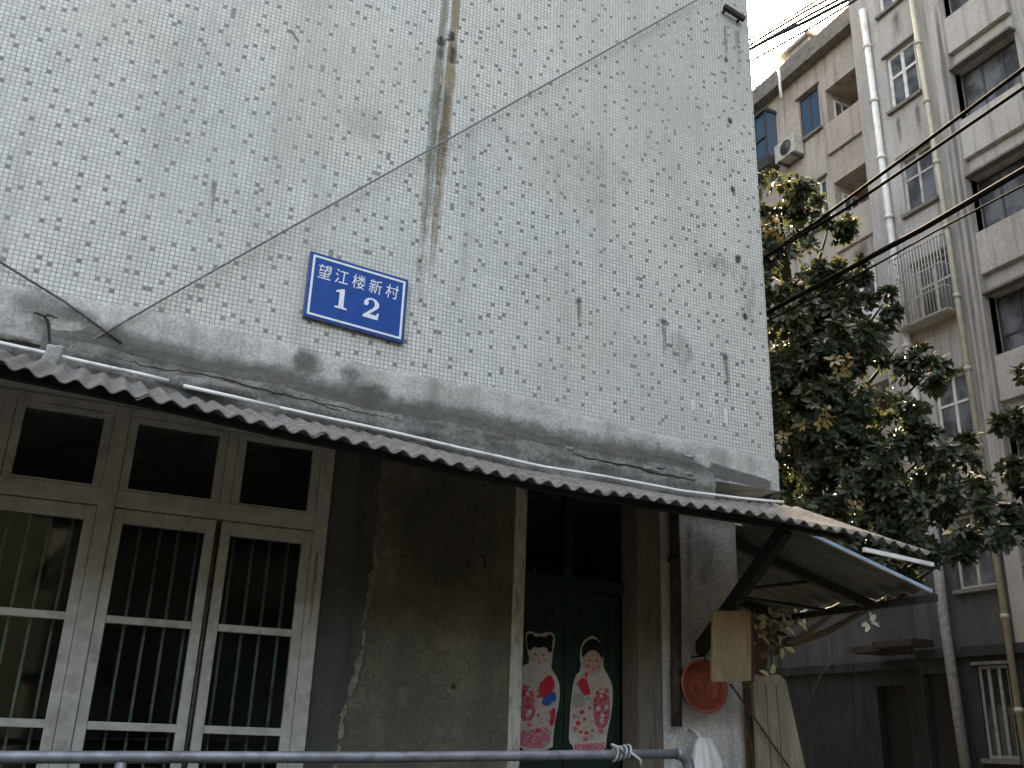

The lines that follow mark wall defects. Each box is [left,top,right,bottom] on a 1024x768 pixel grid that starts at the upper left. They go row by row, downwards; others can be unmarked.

rust [422,0,460,239]
crack [107,355,404,422]
leakage [14,295,770,489]
crack [573,453,697,480]
peeling [336,550,378,751]